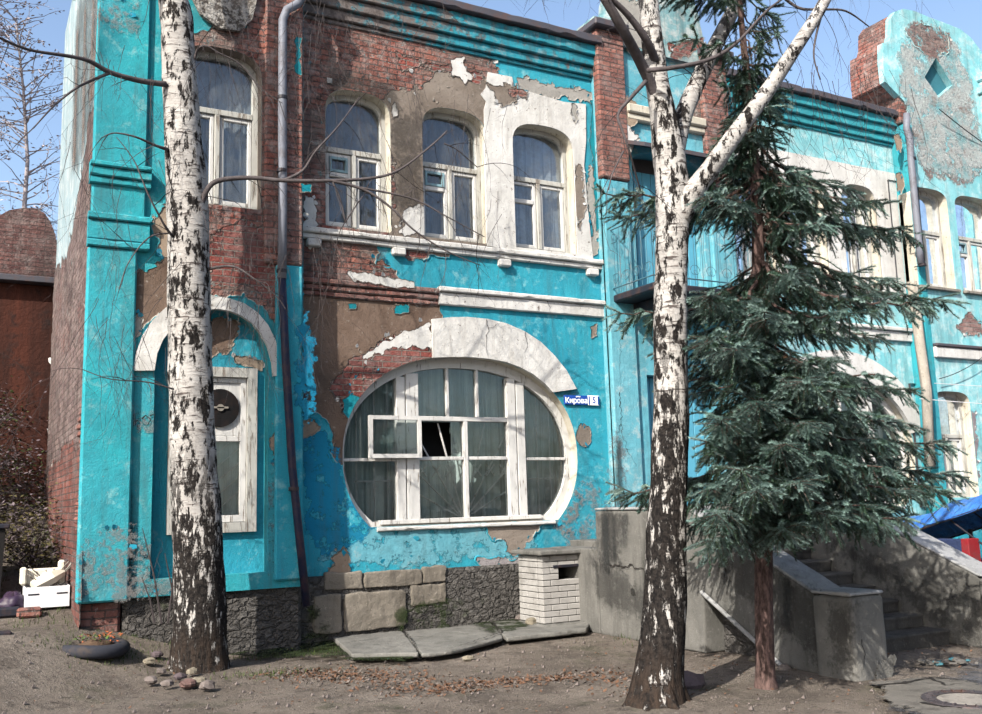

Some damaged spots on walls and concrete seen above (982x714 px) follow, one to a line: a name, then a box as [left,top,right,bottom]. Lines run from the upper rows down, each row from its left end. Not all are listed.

flaking render [194,0,276,323]
peeling [893,20,982,188]
flaking render [135,202,167,337]
flaking render [211,314,265,371]
flaking render [294,18,599,573]
flaking render [956,311,982,337]